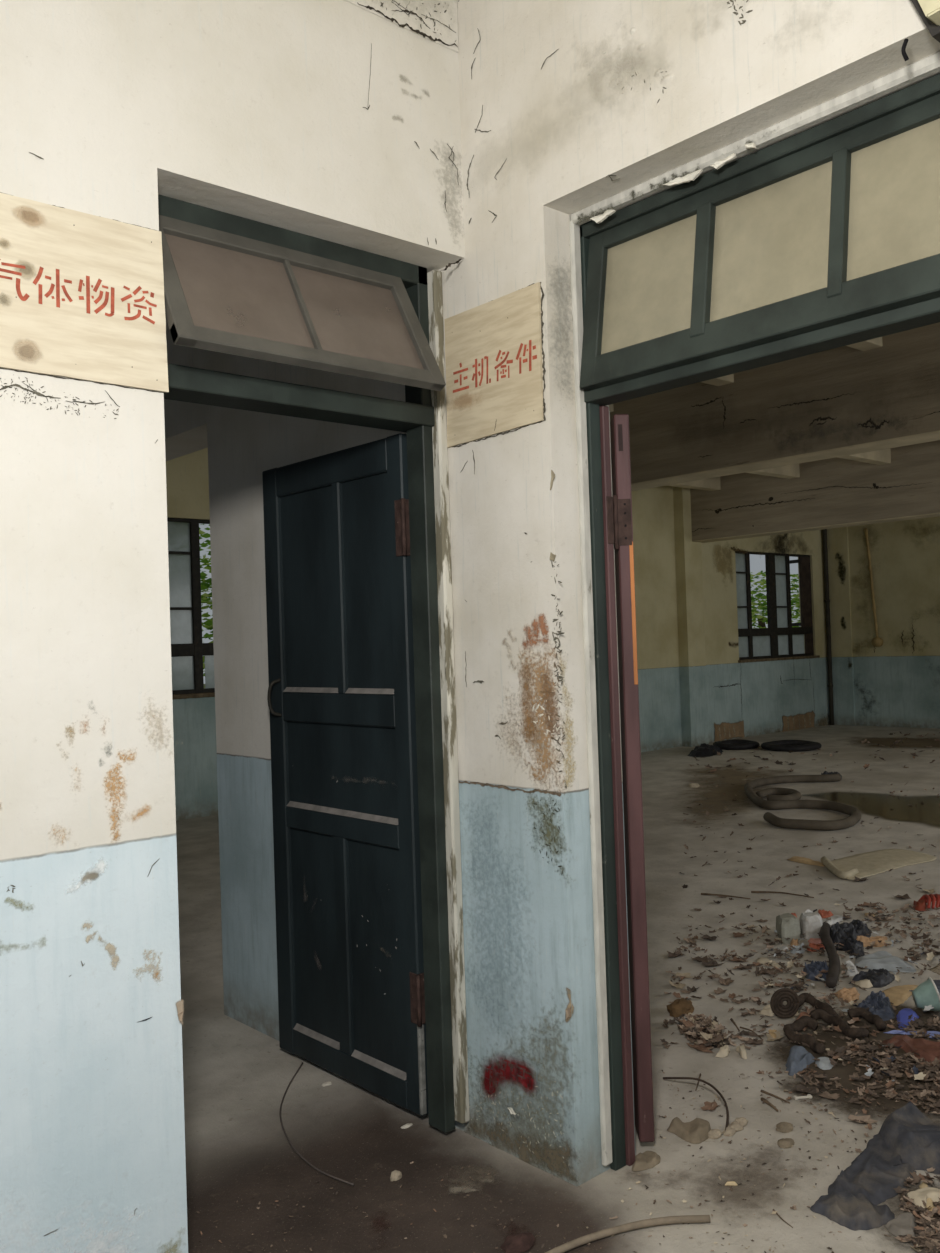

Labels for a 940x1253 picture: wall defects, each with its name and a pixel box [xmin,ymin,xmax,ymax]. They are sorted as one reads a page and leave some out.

crack [357,2,458,47]
peeling [631,141,757,200]
peeling [576,203,616,224]
crack [0,377,120,419]
crack [740,394,890,430]
rust [519,649,574,788]
rust [105,754,148,838]
damp [528,798,564,875]
peeling [83,923,119,967]
peeling [136,950,160,979]